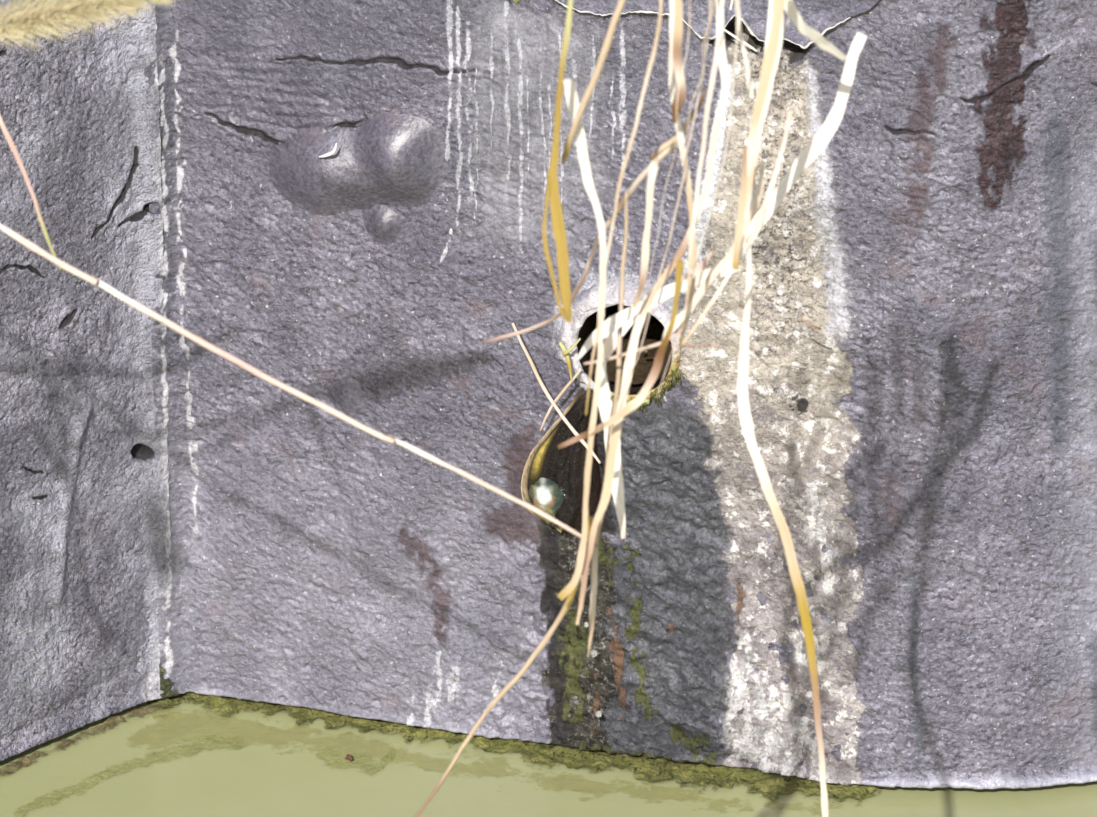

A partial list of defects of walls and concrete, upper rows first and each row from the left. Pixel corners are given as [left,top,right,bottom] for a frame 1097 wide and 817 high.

crack [91,146,147,240]
crack [275,55,491,76]
leakage [439,0,578,263]
leakage [558,35,596,137]
leakage [610,23,627,168]
spalling [555,0,879,785]
leakage [536,400,844,785]